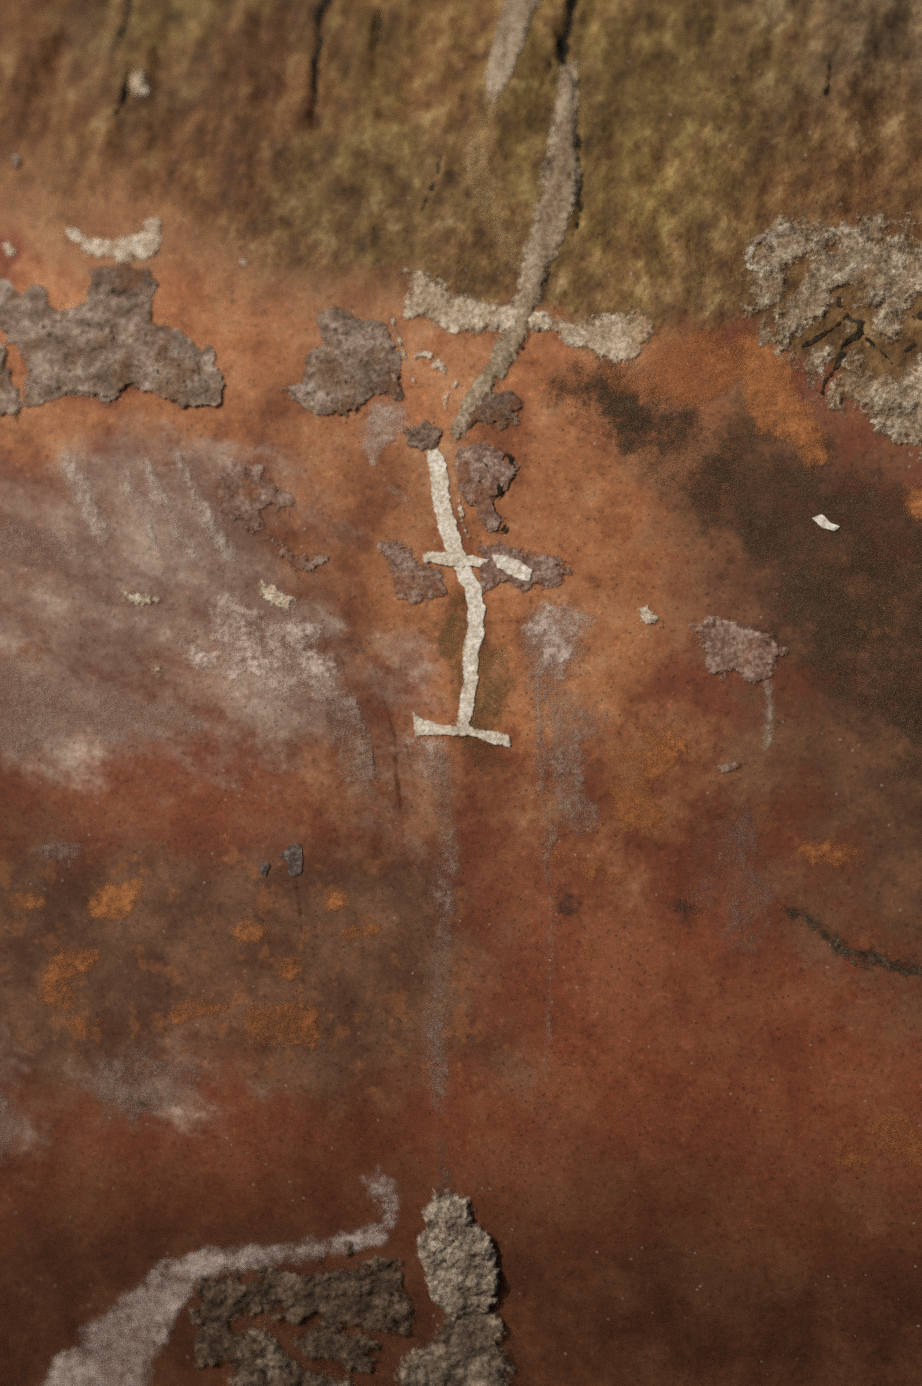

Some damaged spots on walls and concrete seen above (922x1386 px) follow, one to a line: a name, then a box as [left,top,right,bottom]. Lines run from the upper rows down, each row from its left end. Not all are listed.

crack [112,0,131,115]
crack [310,0,332,130]
flaking render [0,262,224,421]
spalling [740,210,922,459]
flaking render [454,389,571,593]
efflorescence [184,593,374,783]
corrosion [43,950,99,1033]
corrosion [90,880,141,918]
crack [785,907,922,979]
efflorescence [299,1185,397,1253]
efflorescence [46,1247,281,1386]
spalling [188,1240,514,1386]